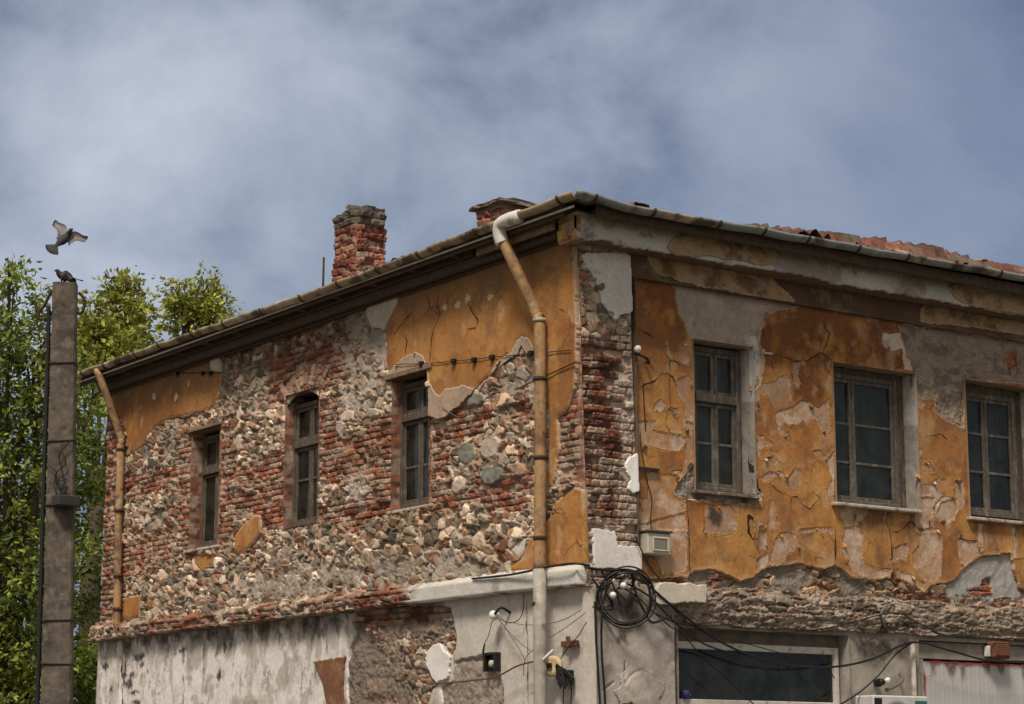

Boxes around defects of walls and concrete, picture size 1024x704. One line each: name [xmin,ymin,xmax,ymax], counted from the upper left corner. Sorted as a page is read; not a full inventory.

peeling [388,352,474,419]
crack [395,297,478,363]
peeling [489,336,534,376]
crack [640,330,679,413]
crack [744,325,830,369]
spalling [638,234,1024,610]
crack [747,456,821,540]
crack [886,516,916,562]
spalling [349,606,504,704]